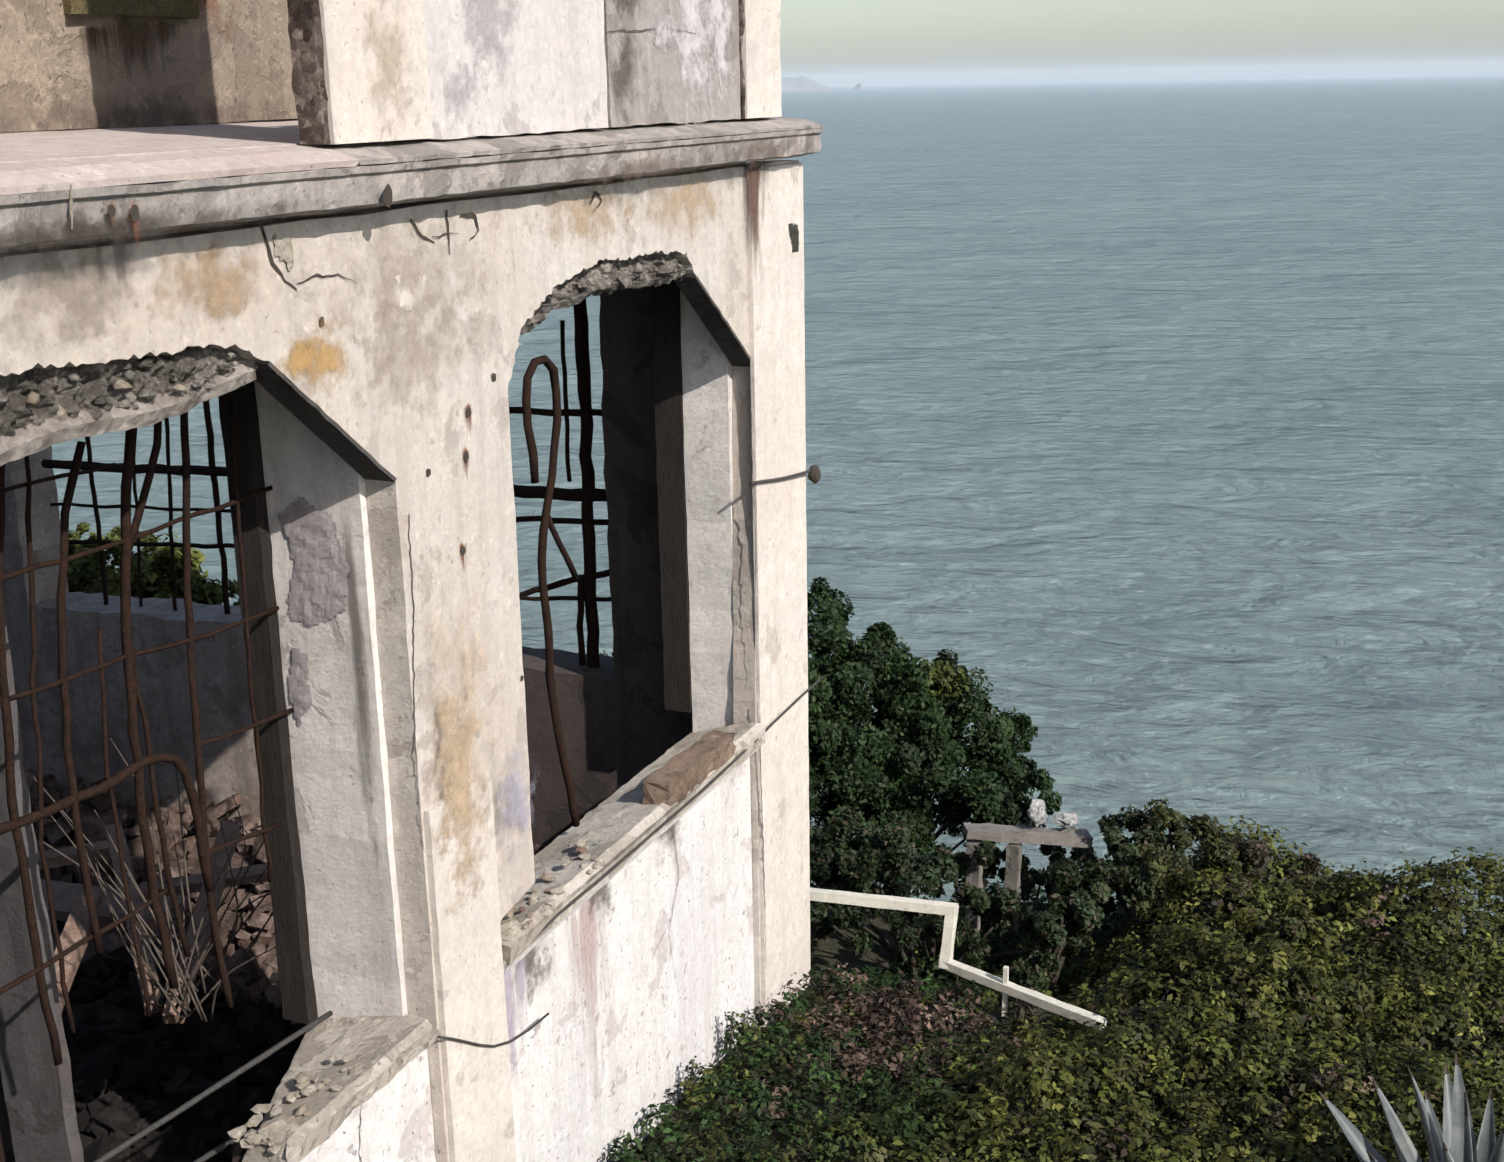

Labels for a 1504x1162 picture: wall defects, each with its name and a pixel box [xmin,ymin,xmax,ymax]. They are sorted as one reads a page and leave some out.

crack [234,215,355,290]
crack [410,210,479,254]
spalling [509,253,688,668]
spalling [0,346,351,1066]
spalling [500,838,606,942]
spalling [227,1054,365,1154]